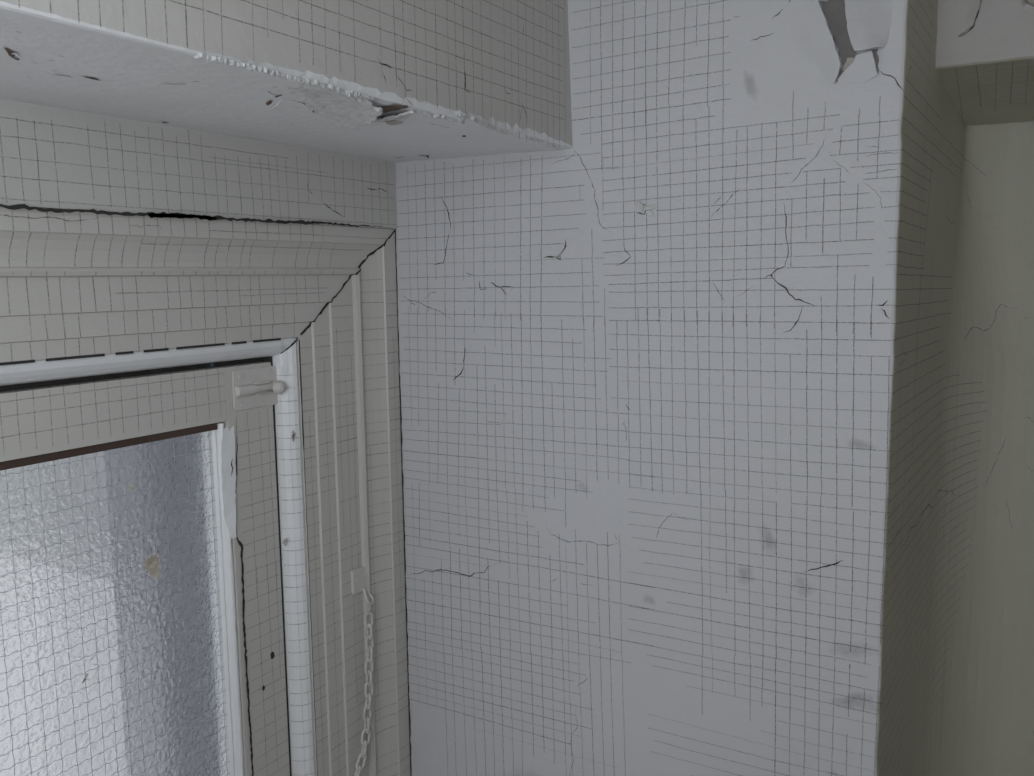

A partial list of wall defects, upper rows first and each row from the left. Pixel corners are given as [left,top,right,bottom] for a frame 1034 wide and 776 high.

spalling [194,53,564,149]
peeling [778,0,894,84]
crack [713,139,896,333]
crack [0,183,491,776]